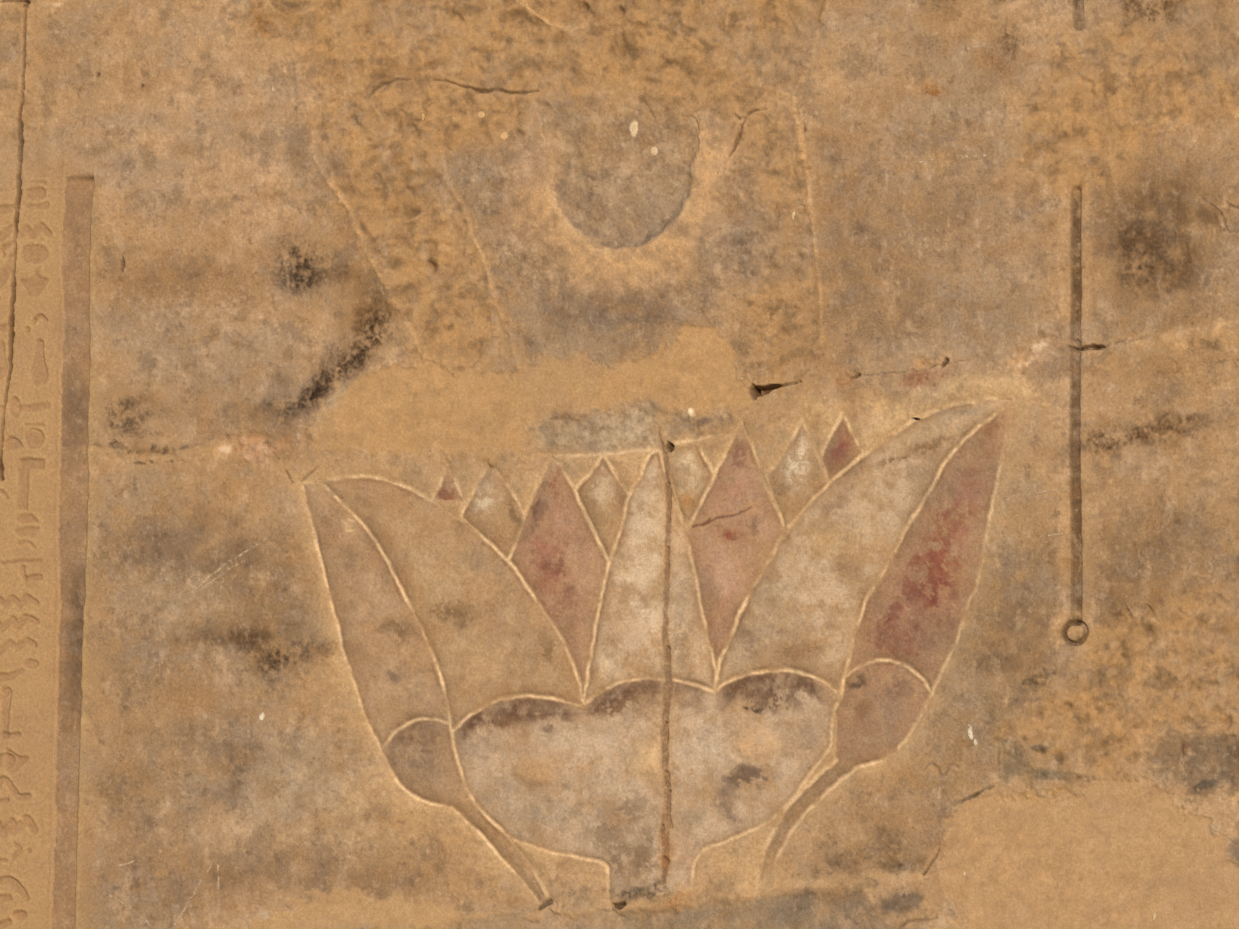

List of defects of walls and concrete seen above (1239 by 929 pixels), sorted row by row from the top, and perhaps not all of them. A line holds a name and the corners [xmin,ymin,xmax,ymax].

crack [369,78,540,97]
spalling [250,0,826,384]
crack [0,0,30,481]
crack [1070,336,1148,354]
crack [852,359,972,380]
crack [751,382,802,400]
crack [658,428,753,886]